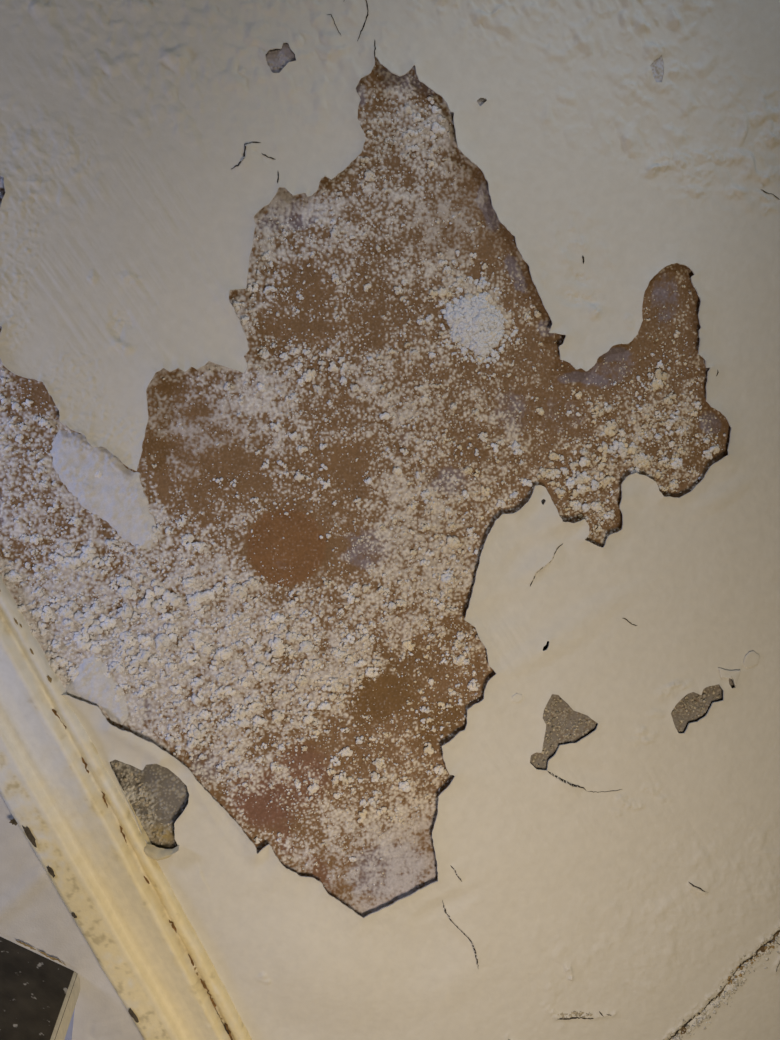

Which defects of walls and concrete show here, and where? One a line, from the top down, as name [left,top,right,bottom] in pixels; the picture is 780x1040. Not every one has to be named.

peeling [261,37,302,81]
damp [438,276,518,368]
peeling [538,638,555,656]
peeling [524,689,602,775]
peeling [666,678,740,738]
peeling [9,819,37,848]
peeling [104,755,194,861]
crack [663,928,780,1040]